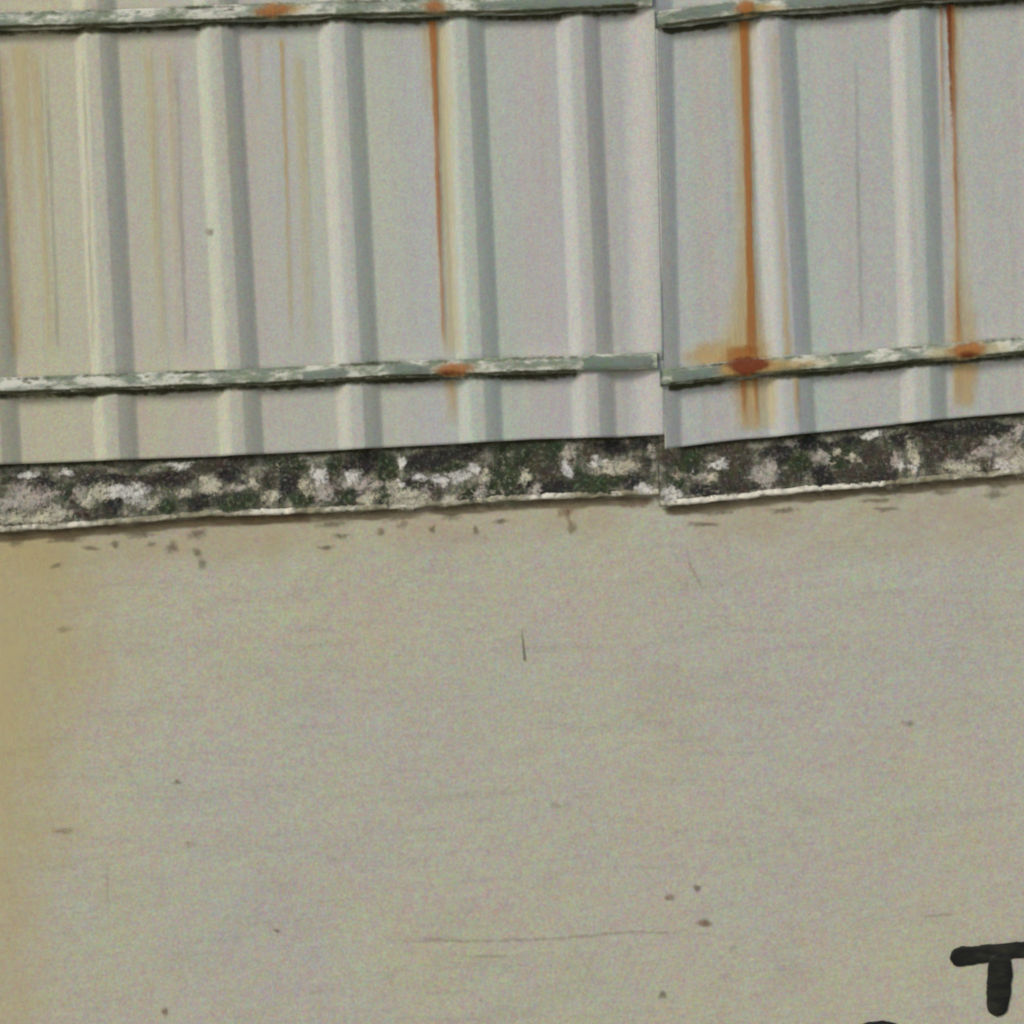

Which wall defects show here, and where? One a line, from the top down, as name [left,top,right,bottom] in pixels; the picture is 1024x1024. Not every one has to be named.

corrosion [427,0,445,335]
corrosion [697,0,778,421]
corrosion [940,4,958,238]
corrosion [438,363,473,375]
water stain [0,418,1024,547]
corrosion [949,270,995,399]